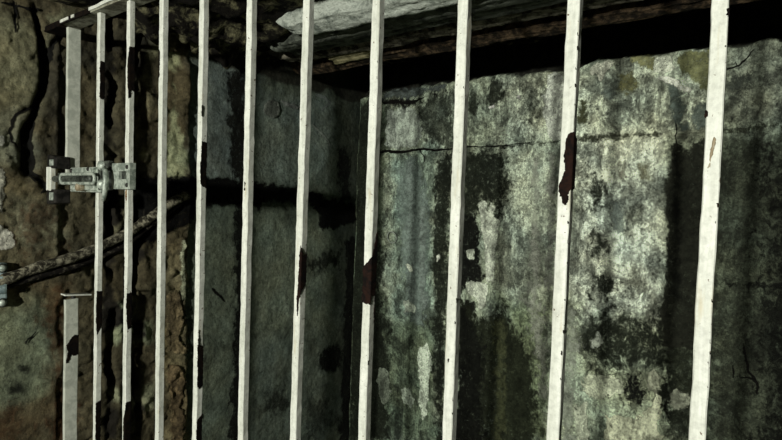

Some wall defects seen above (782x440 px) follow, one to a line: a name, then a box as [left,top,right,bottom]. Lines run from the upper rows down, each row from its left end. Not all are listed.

crack [726,49,754,70]
damp [468,76,505,115]
crack [577,123,677,143]
crack [728,123,776,133]
crack [379,141,558,163]
damp [561,84,706,440]
damp [456,144,541,440]